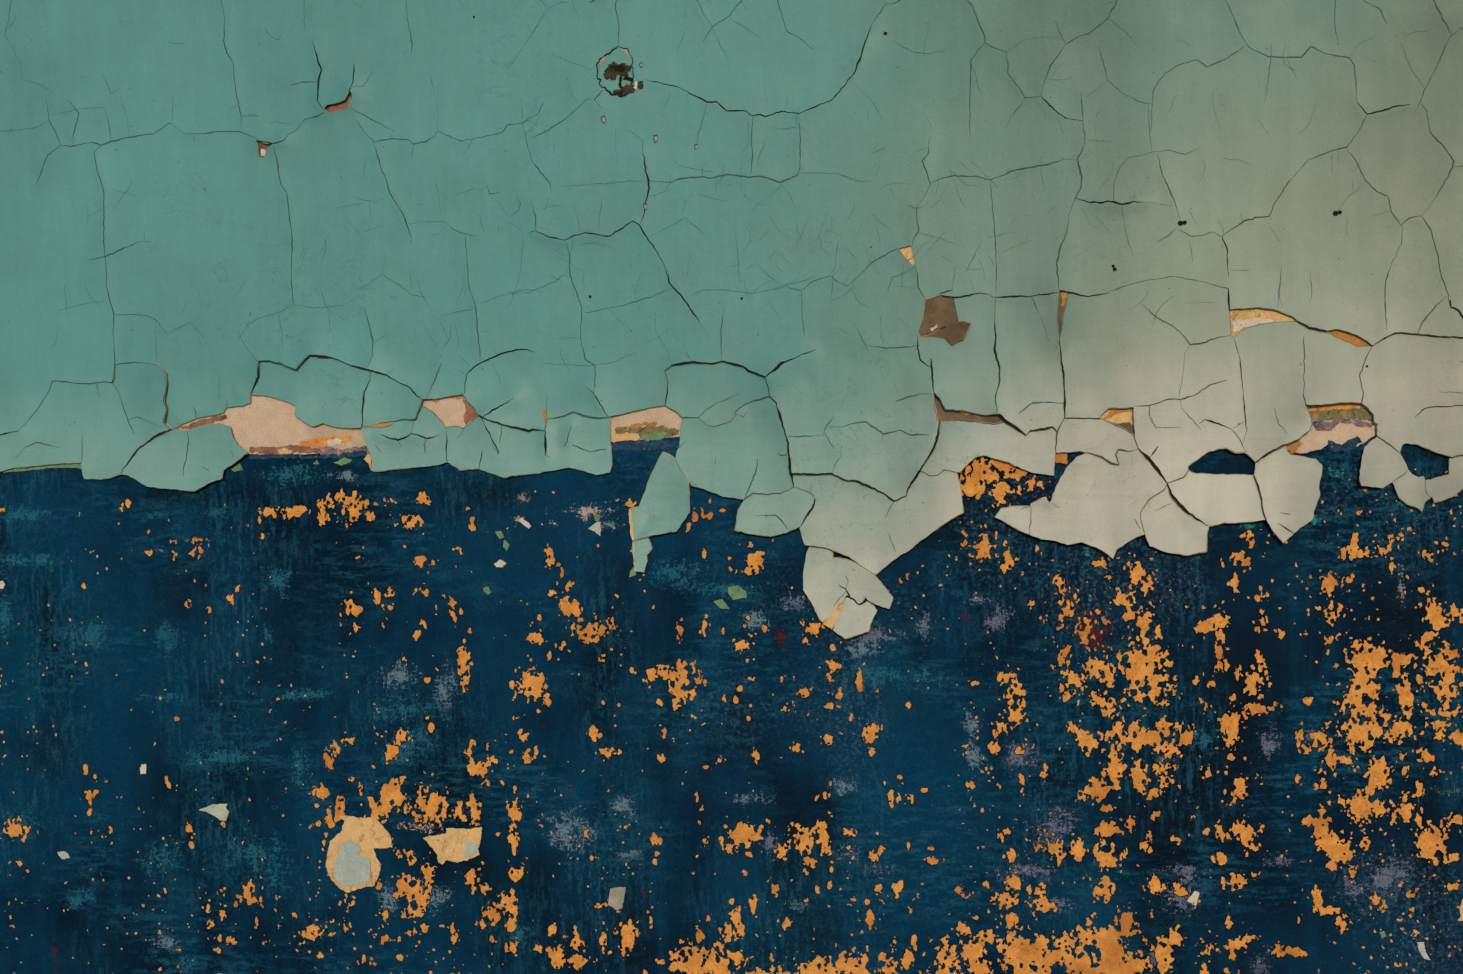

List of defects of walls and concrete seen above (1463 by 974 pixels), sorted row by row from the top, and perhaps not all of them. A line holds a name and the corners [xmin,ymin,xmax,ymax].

spalling [596,46,644,98]
crack [0,0,1463,553]
peeling [0,277,1463,639]
corrosion [1060,592,1112,651]